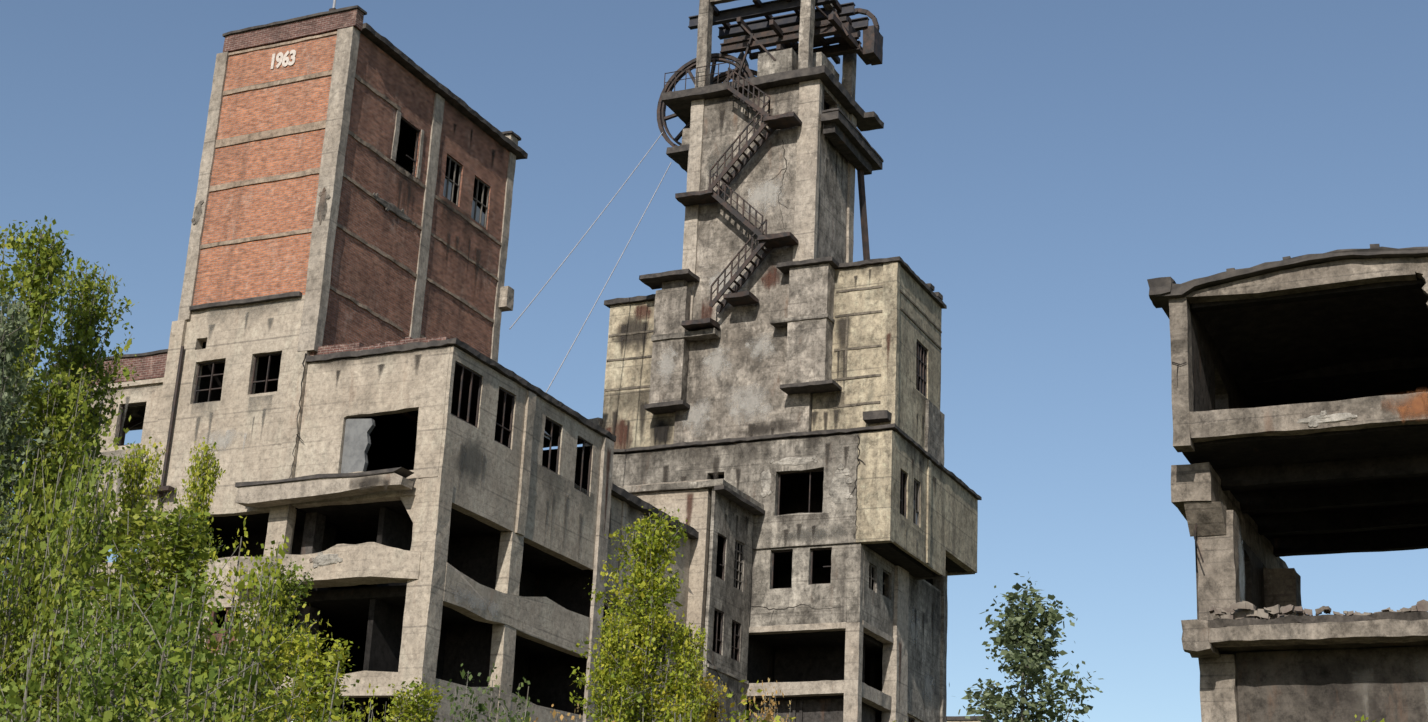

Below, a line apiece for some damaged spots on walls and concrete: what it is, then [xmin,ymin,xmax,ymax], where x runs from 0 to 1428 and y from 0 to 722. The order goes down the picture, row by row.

corrosion [1398,392,1428,417]
damp [613,390,671,454]
damp [460,445,485,478]